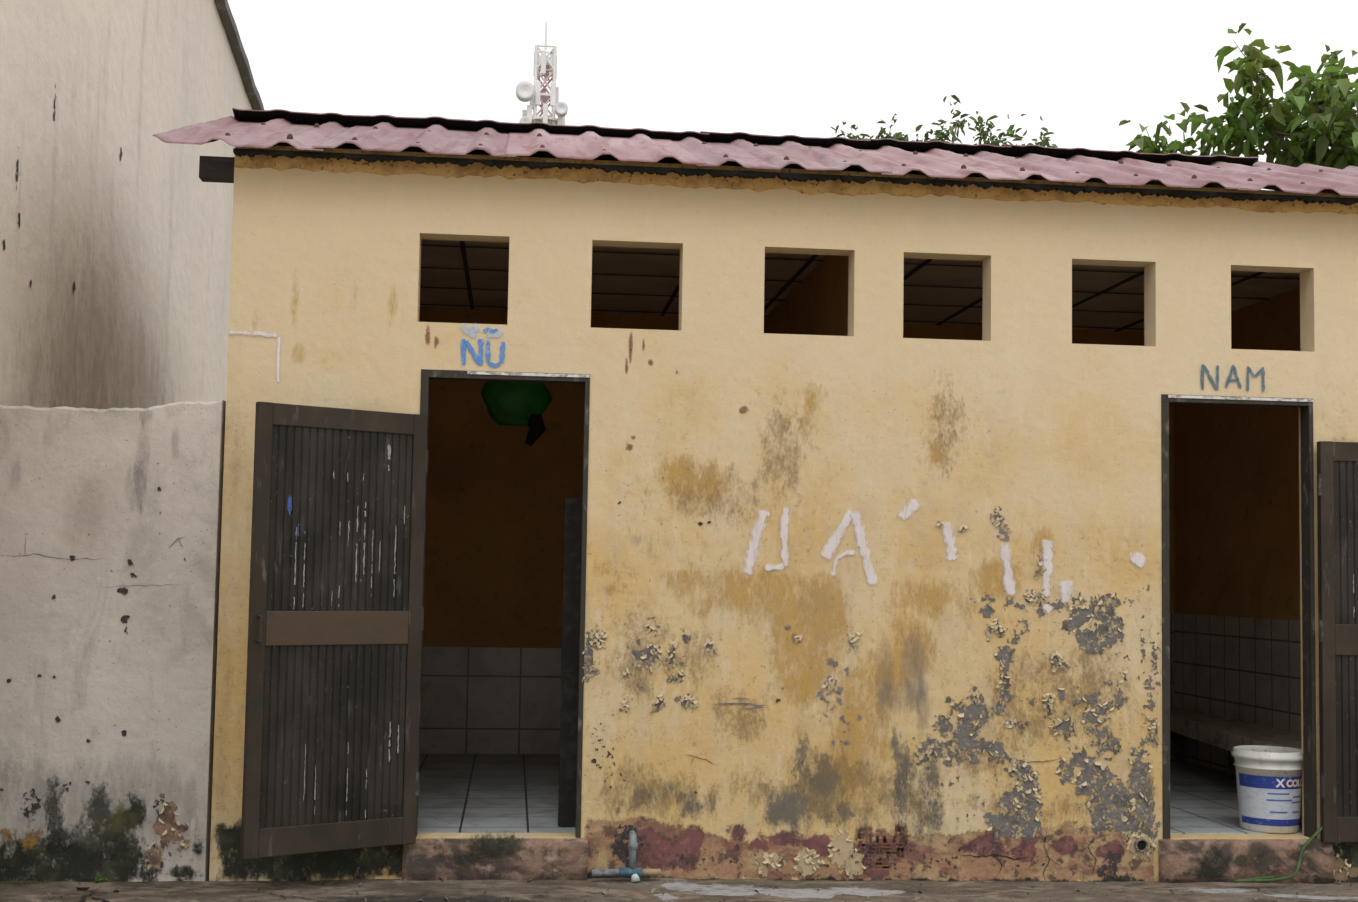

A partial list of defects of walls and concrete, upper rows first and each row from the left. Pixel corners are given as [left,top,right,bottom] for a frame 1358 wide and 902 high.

peeling [989,506,1012,541]
peeling [582,625,608,682]
peeling [591,616,719,790]
peeling [611,549,1162,880]
water stain [0,779,403,885]
water stain [329,894,525,902]
water stain [434,833,534,867]
water stain [1179,842,1358,900]